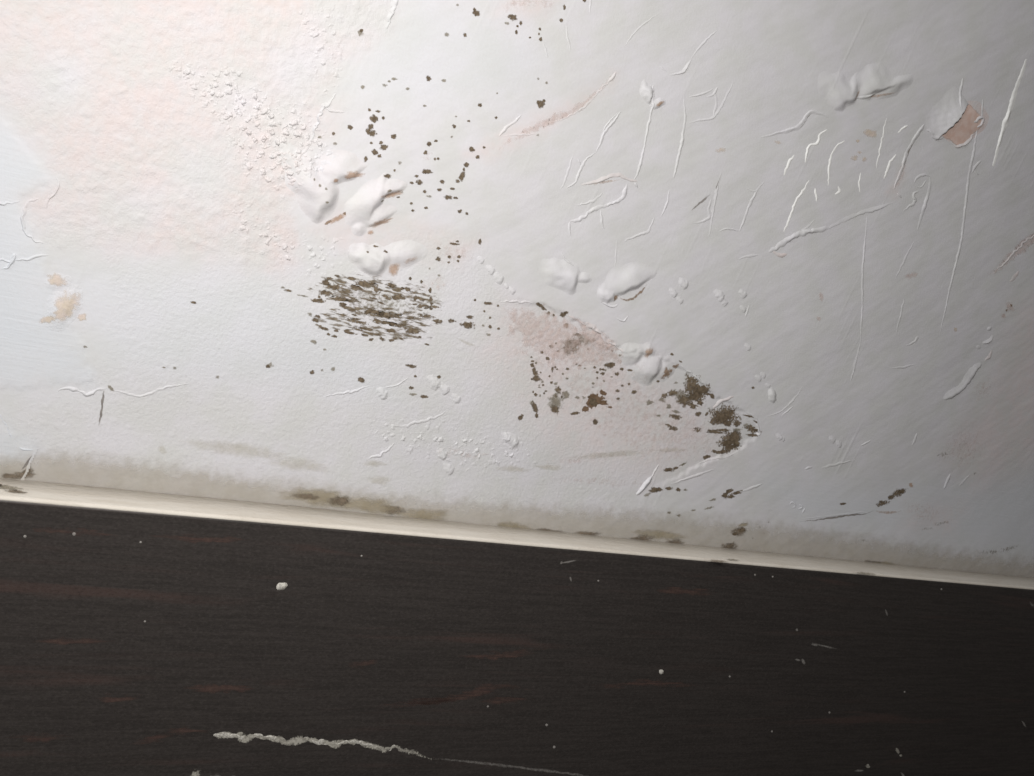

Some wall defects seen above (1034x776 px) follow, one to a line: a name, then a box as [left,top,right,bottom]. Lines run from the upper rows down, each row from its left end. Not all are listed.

mould [281,274,500,345]
mould [518,303,636,425]
mould [647,374,758,459]